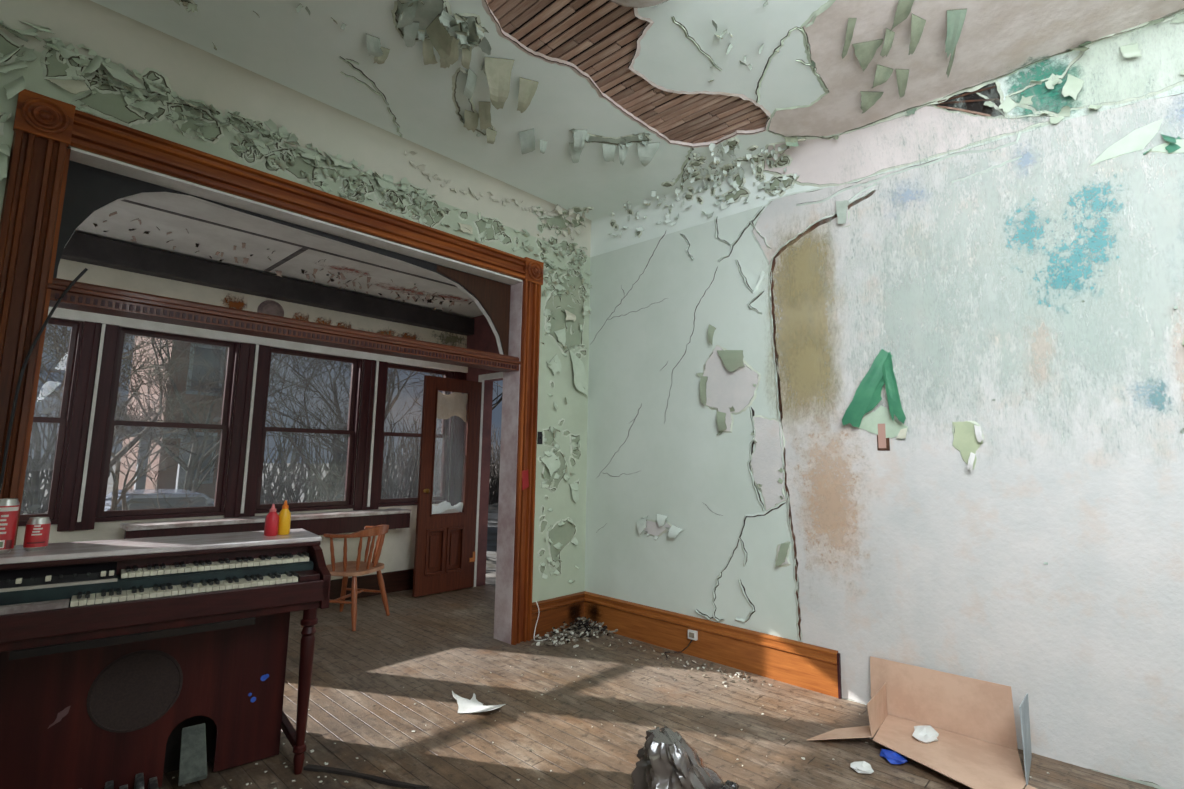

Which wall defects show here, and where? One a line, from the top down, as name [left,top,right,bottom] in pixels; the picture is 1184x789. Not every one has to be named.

damp [1007,57,1076,118]
peeling [0,20,594,583]
peeling [391,0,1184,789]
damp [772,238,834,409]
crack [593,131,1022,640]
damp [1005,183,1123,308]
damp [1148,381,1171,414]